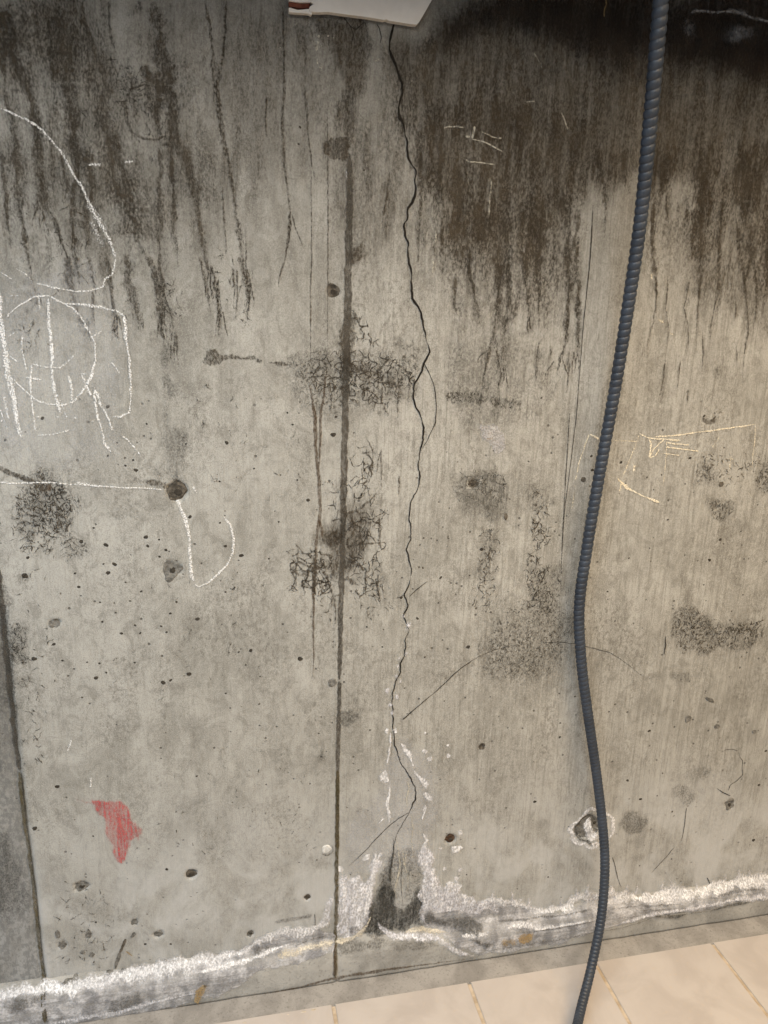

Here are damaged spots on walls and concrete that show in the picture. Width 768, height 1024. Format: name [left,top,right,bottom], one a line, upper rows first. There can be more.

leakage [0,0,254,359]
leakage [257,13,306,184]
leakage [278,200,312,284]
leakage [387,0,653,386]
leakage [650,0,768,353]
leakage [290,297,419,415]
leakage [1,469,51,492]
mould [286,442,390,621]
crack [344,18,518,879]
leakage [0,728,768,1024]
spalling [567,807,615,850]